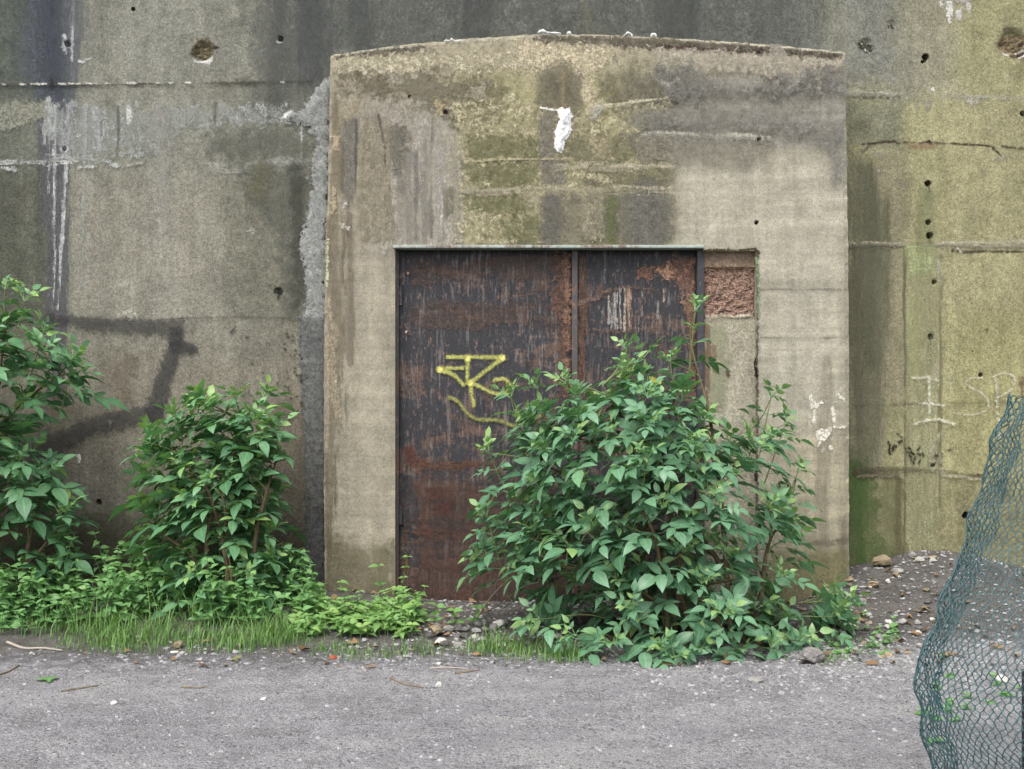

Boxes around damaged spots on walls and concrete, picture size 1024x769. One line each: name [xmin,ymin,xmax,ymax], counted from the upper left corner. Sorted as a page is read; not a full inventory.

spalling [191,37,220,66]
spalling [993,34,1024,63]
crack [861,140,1023,162]
damp [0,0,907,575]
rust [543,250,730,401]
spalling [705,312,754,324]
crack [704,247,760,596]
rust [399,445,566,602]